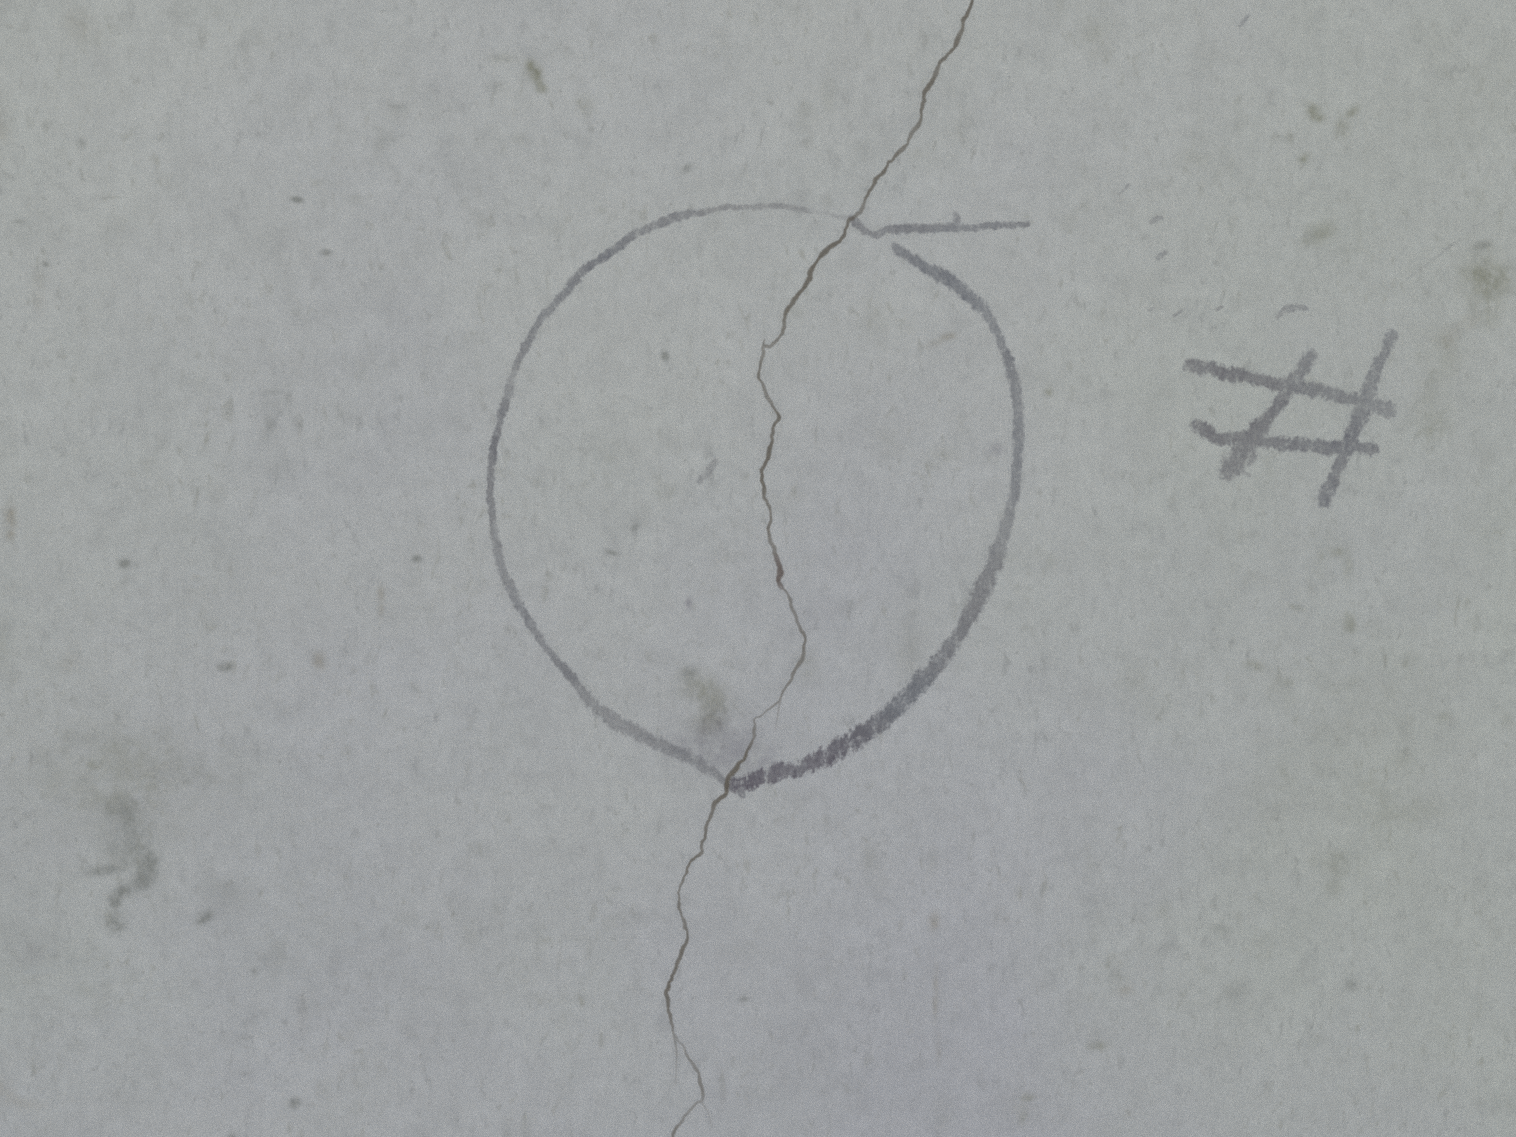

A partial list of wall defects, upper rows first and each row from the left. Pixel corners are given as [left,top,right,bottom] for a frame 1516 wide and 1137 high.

crack [661,0,976,1137]